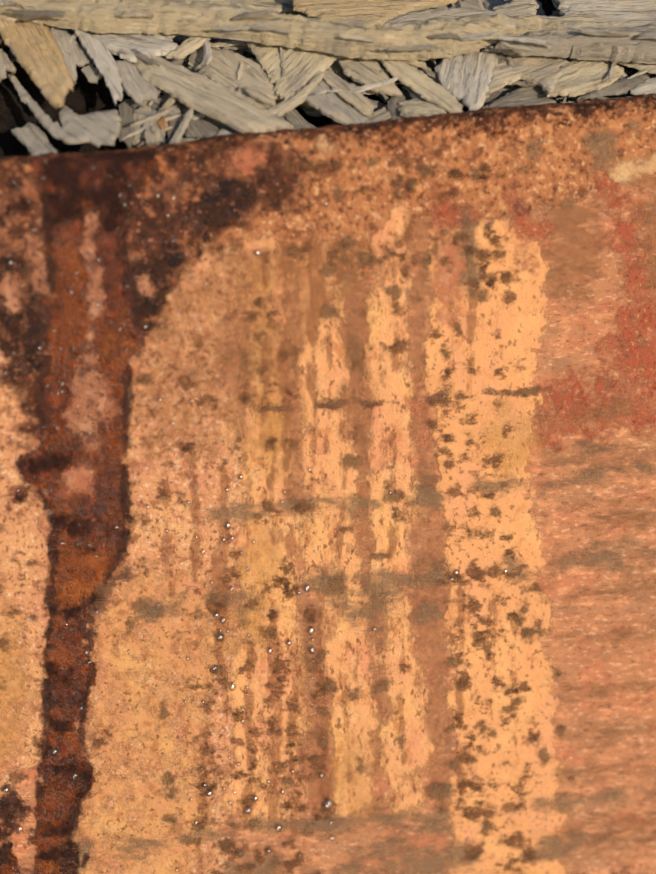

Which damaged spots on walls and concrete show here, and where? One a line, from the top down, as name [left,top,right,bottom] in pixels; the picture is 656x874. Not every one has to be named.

corrosion [425,225,450,285]
corrosion [534,215,656,451]
water stain [315,398,381,410]
water stain [426,391,473,406]
water stain [484,387,540,397]
water stain [410,487,444,506]
water stain [472,479,515,494]
water stain [304,555,535,630]
water stain [249,763,531,833]
water stain [127,839,159,859]
water stain [507,832,588,865]
corrosion [0,853,19,874]